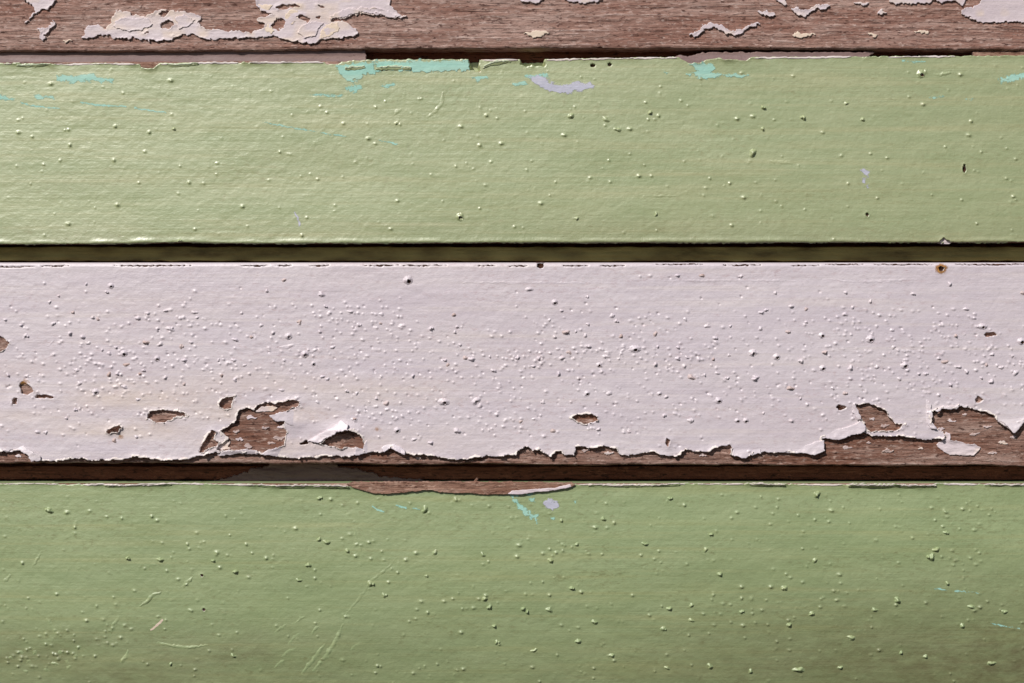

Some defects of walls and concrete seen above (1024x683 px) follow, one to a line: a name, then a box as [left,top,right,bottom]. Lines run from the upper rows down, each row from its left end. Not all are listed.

peeling [24,0,56,41]
peeling [63,0,407,44]
peeling [524,30,549,39]
peeling [689,0,830,38]
peeling [854,0,1024,23]
peeling [0,394,1024,466]
spalling [257,481,575,524]